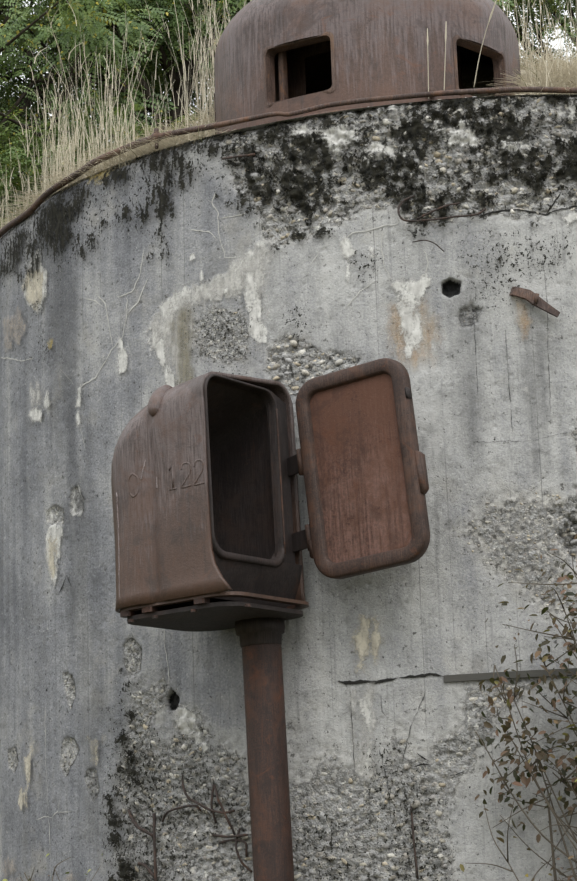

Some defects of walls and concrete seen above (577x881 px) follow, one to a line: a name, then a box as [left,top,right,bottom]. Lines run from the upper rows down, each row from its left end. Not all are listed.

spalling [219,96,577,245]
crack [476,191,577,225]
leakage [22,250,48,313]
leakage [146,237,275,387]
spalling [266,334,361,395]
spalling [442,280,461,298]
spalling [459,303,481,326]
spalling [458,492,577,615]
spalling [124,638,142,675]
spalling [113,676,253,881]
crack [338,673,444,817]
spalling [289,679,536,881]